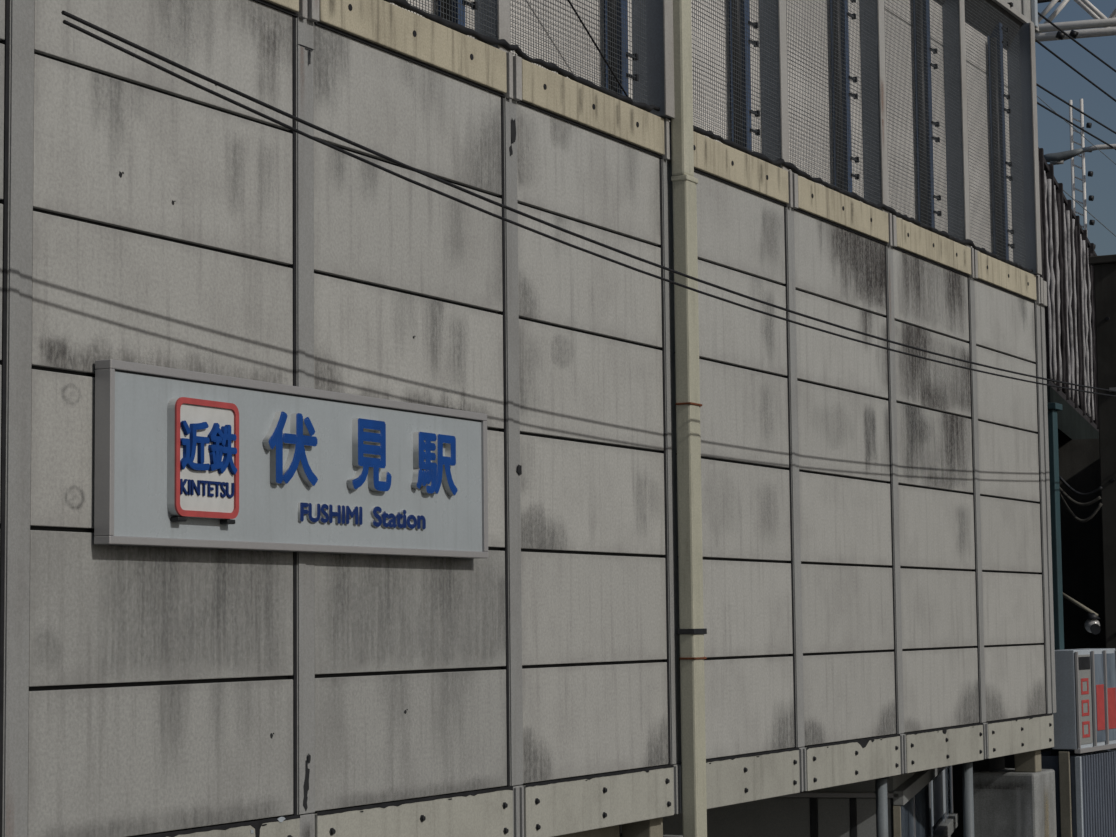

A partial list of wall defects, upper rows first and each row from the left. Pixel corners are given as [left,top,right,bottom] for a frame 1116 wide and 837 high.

peeling [303,753,311,811]